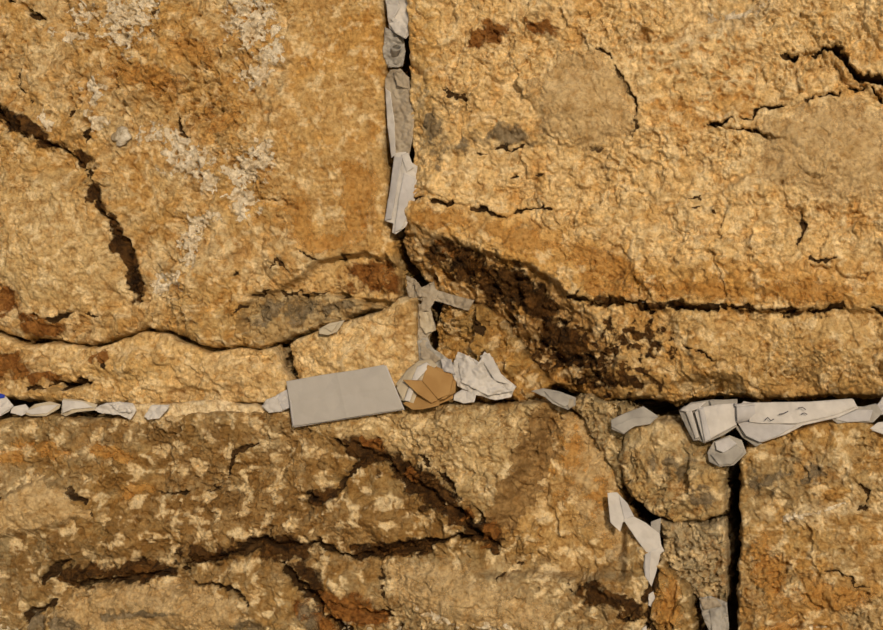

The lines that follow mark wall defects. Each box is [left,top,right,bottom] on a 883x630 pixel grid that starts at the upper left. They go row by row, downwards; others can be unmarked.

crack [0,106,94,181]
crack [477,144,525,156]
crack [595,47,639,137]
crack [707,105,784,139]
crack [780,45,883,104]
crack [414,196,553,218]
crack [335,438,413,492]
crack [418,454,456,507]
crack [24,559,71,624]
crack [182,535,272,607]
crack [282,561,354,630]
crack [309,508,488,627]